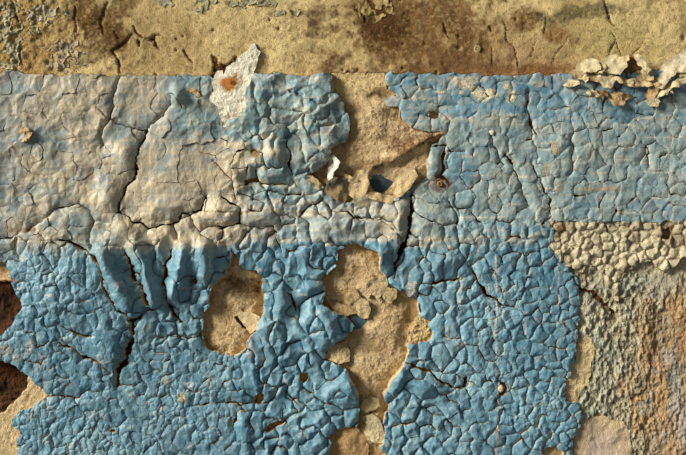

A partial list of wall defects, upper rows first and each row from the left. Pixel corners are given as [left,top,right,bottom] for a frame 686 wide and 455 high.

water stain [73,0,127,56]
water stain [350,0,550,75]
water stain [558,3,616,19]
rust [222,75,238,90]
crack [135,197,241,229]
peeling [0,0,479,455]
crack [393,194,414,271]
peeling [383,48,686,455]
crack [117,250,183,384]
crack [432,271,514,307]
crack [578,286,614,314]
crack [406,362,467,388]